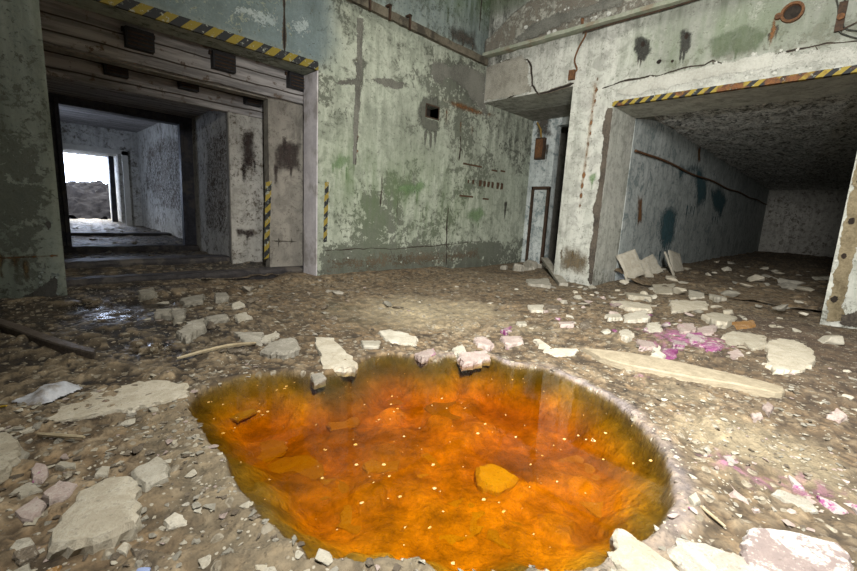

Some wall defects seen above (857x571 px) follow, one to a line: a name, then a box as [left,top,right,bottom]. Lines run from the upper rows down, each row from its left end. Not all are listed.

spalling [515,0,623,42]
spalling [484,53,531,101]
leakage [634,37,650,66]
leakage [679,30,691,61]
peeling [637,45,857,97]
leakage [241,133,256,179]
leakage [274,139,299,182]
spalling [826,164,857,327]